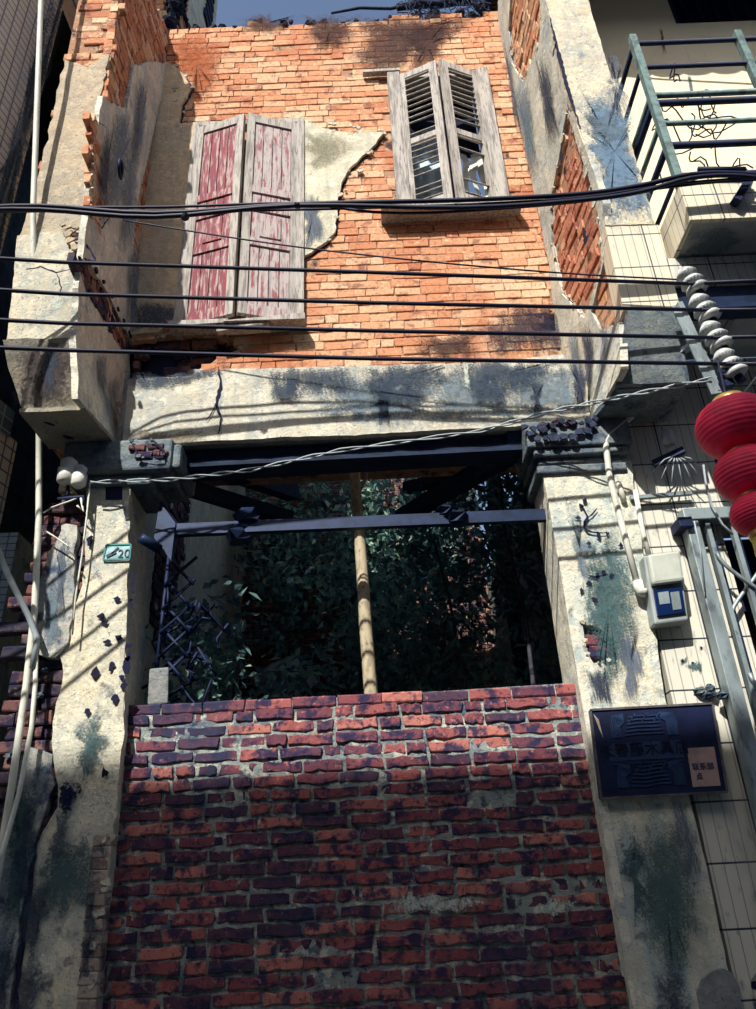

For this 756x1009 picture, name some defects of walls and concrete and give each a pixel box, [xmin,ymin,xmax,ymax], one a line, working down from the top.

leakage [402,23,453,67]
spalling [508,0,541,79]
spalling [82,111,109,236]
peeling [304,129,386,260]
spalling [549,111,604,316]
spalling [59,223,218,378]
crack [205,366,222,434]
leakage [266,324,607,424]
spalling [91,635,132,703]
leakage [571,516,644,701]
leakage [0,717,108,1009]
leakage [620,806,701,1009]